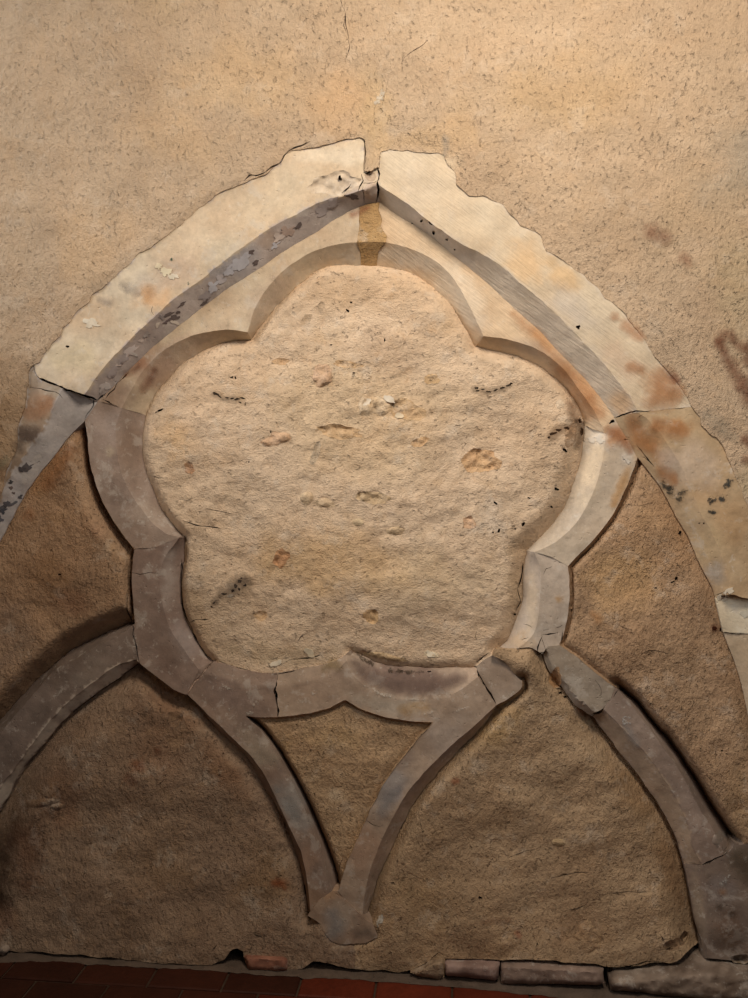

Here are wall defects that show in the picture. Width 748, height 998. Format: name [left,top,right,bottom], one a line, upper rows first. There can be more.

spalling [307,170,376,217]
peeling [198,250,259,306]
peeling [99,301,186,394]
crack [30,375,127,406]
flaking render [358,395,426,421]
peeling [547,418,605,444]
spalling [310,424,362,465]
flaking render [461,448,502,473]
spalling [355,491,391,505]
spalling [272,548,290,569]
peeling [717,587,734,601]
spalling [363,610,378,624]